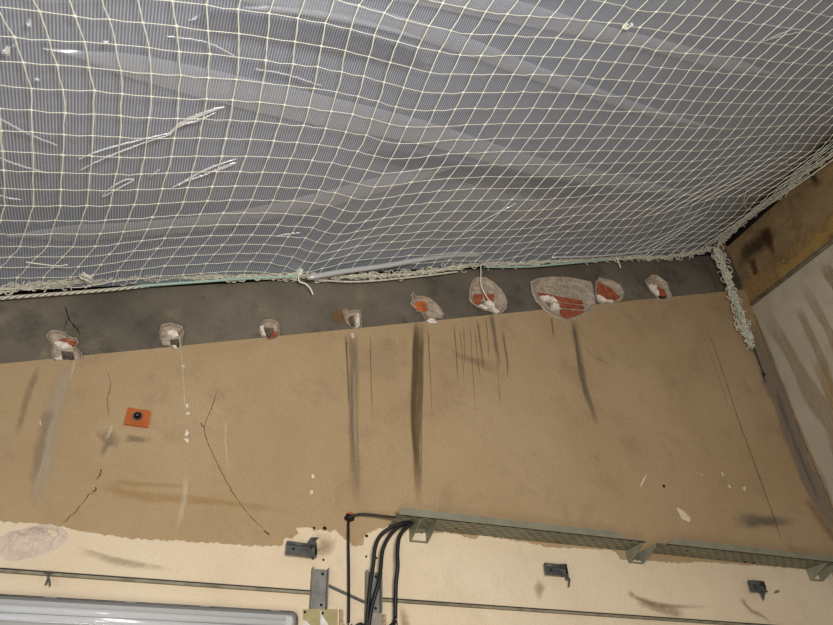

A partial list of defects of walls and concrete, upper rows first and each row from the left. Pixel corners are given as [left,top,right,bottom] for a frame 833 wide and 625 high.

flaking render [46,330,83,361]
flaking render [159,322,184,350]
flaking render [259,319,280,340]
flaking render [343,309,362,339]
flaking render [410,292,444,325]
flaking render [469,277,507,315]
flaking render [530,277,624,321]
flaking render [645,275,672,301]
damp [412,337,431,468]
damp [753,344,833,520]
crack [200,392,269,535]
crack [62,469,102,523]